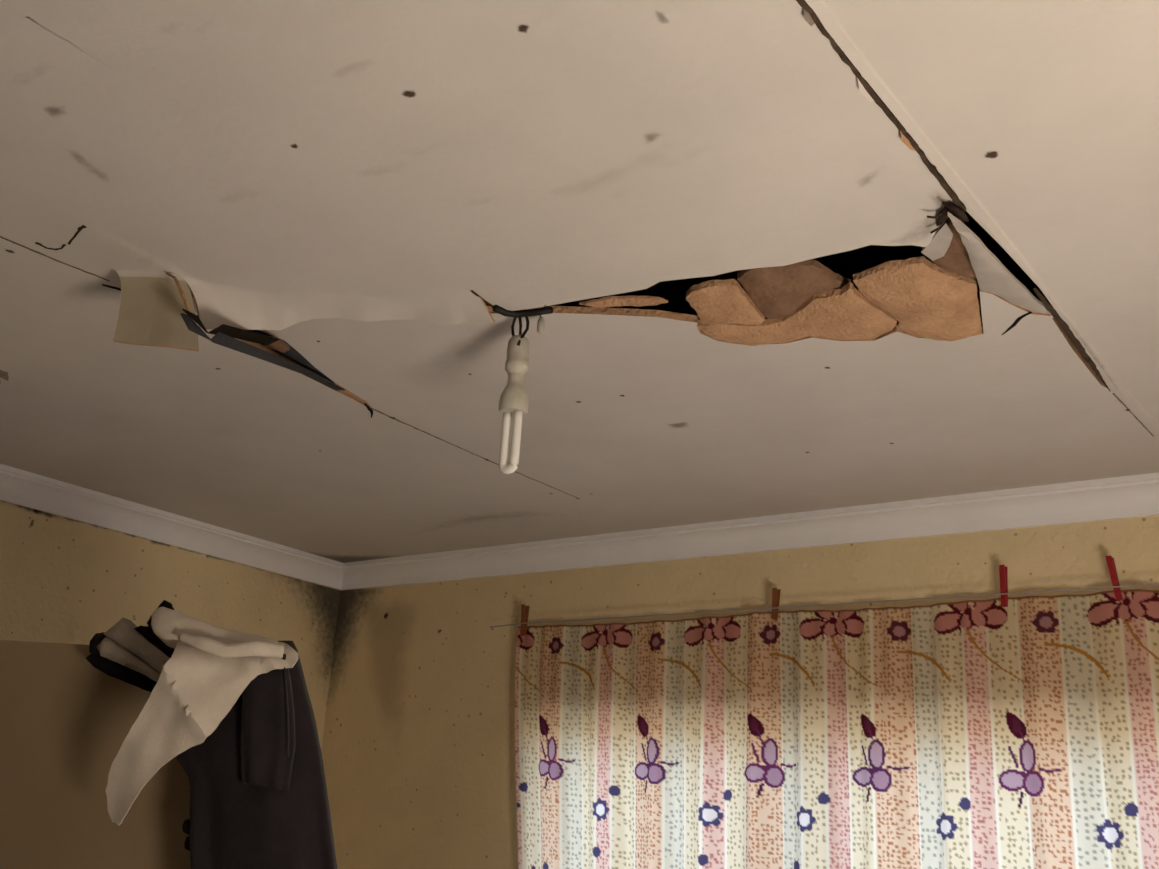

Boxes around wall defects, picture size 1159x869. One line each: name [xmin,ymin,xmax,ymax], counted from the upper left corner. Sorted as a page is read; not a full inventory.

crack [796,0,966,211]
crack [0,225,121,291]
crack [1002,288,1154,437]
crack [364,403,577,498]